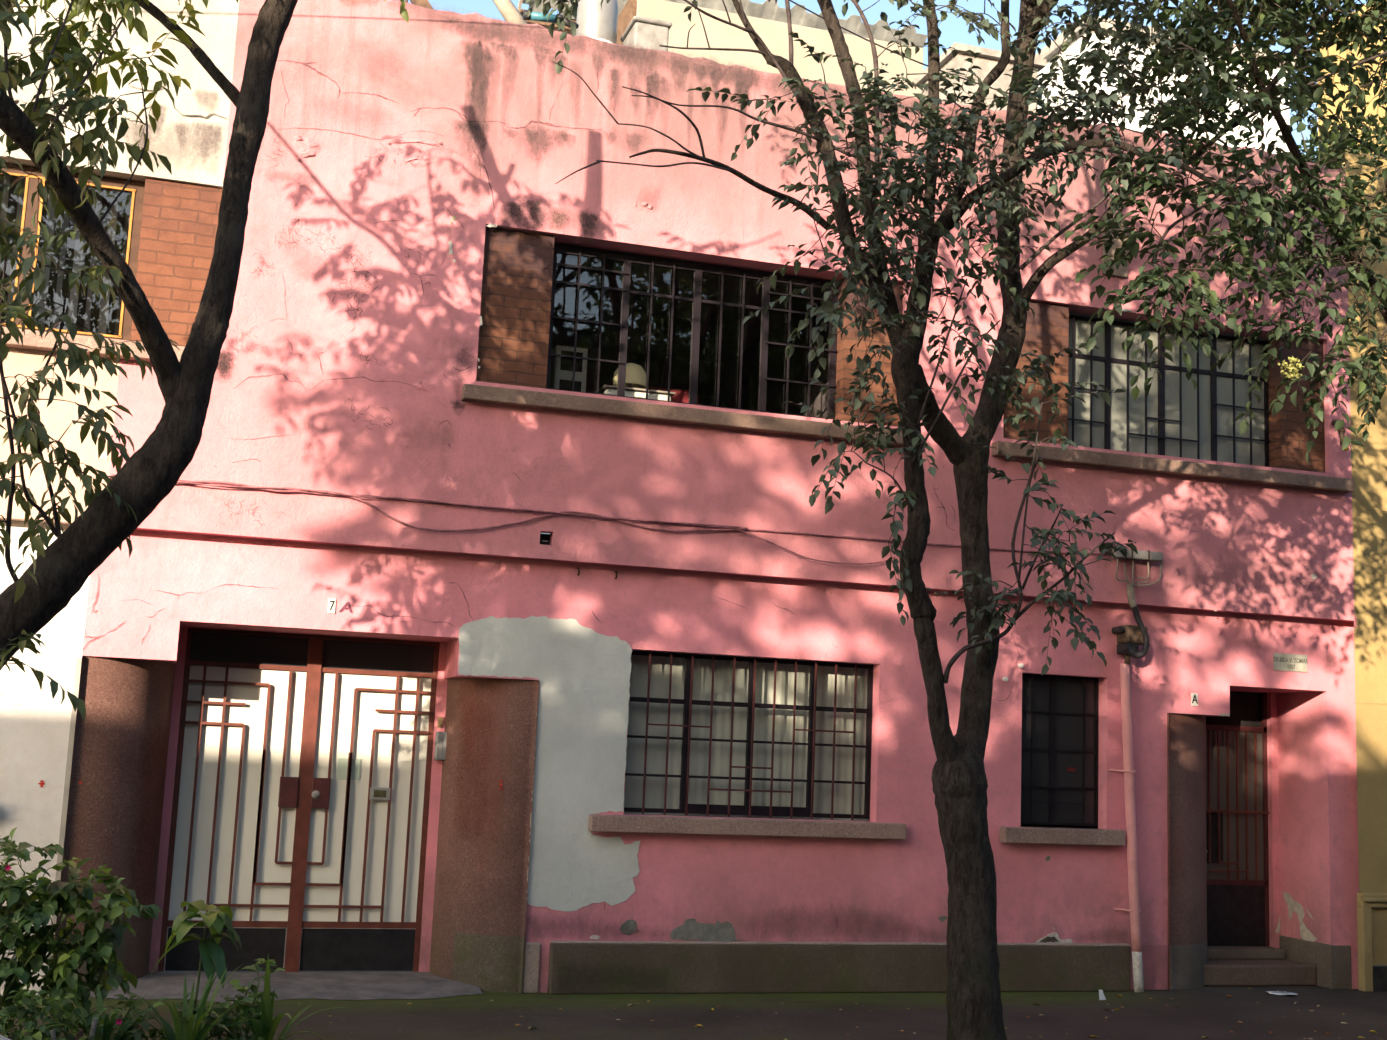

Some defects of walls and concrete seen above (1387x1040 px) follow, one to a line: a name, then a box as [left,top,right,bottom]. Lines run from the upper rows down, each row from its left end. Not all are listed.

crack [277,60,602,205]
water stain [505,201,562,228]
crack [233,277,471,391]
crack [65,578,276,651]
crack [349,582,474,623]
peeling [1275,892,1317,942]